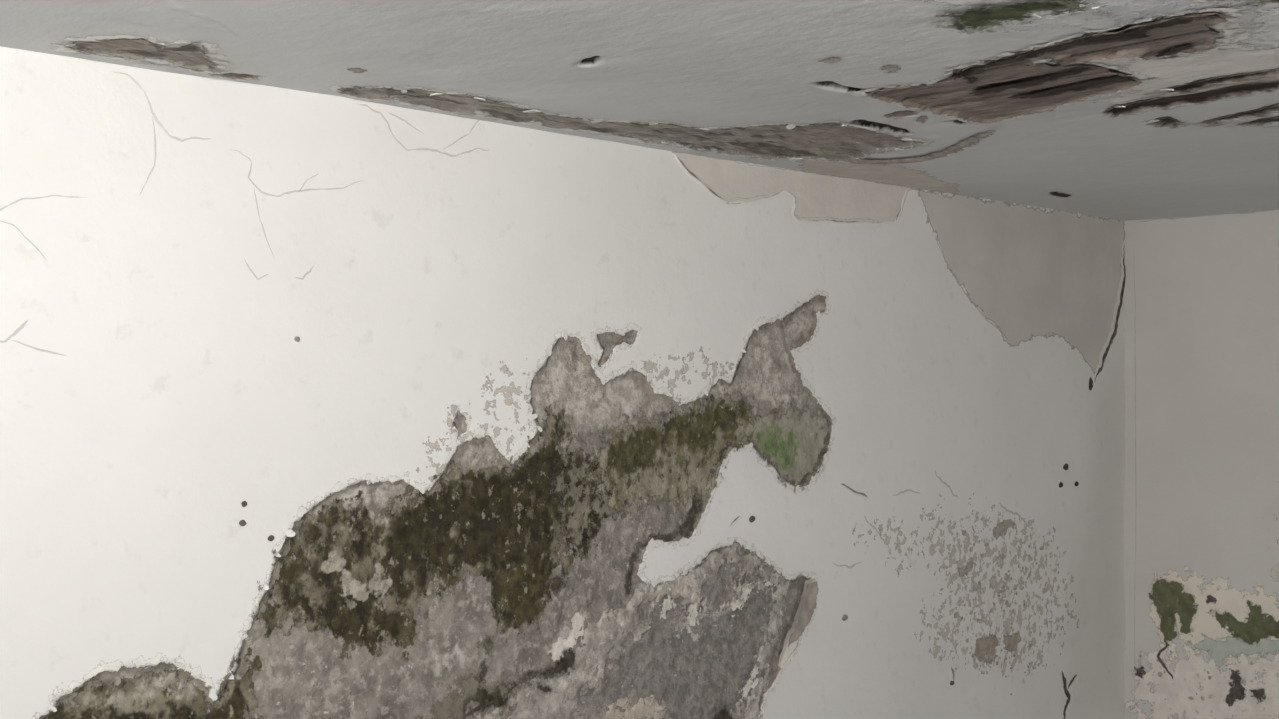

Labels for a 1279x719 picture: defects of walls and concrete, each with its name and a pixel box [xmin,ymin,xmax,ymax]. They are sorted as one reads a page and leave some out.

leakage [932,0,1090,34]
flaking render [849,0,1279,128]
crack [1089,241,1126,390]
leakage [252,348,759,719]
leakage [40,647,263,719]
peeling [1125,566,1279,719]